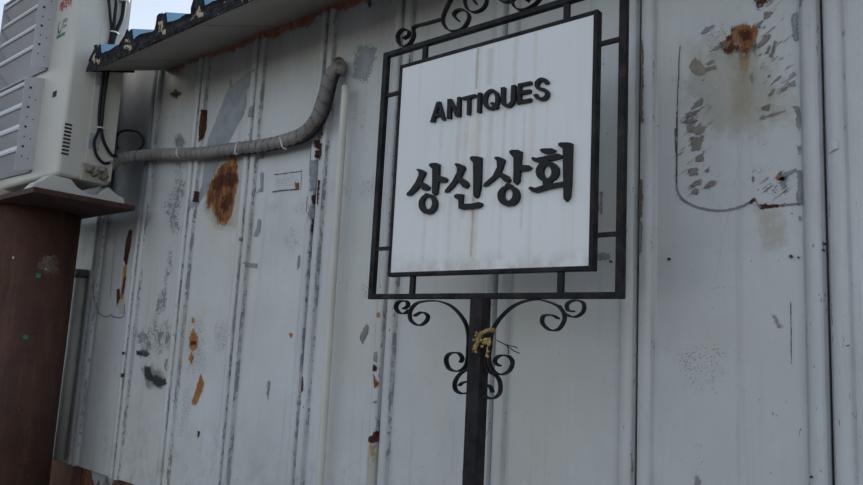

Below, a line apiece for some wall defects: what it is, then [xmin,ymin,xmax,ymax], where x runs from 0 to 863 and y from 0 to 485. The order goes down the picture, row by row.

rust [170,0,372,71]
peeling [353,44,378,86]
peeling [689,25,724,81]
rust [723,23,758,57]
rust [198,109,208,141]
peeling [681,98,715,195]
peeling [760,80,801,129]
rust [192,156,239,225]
peeling [774,169,802,206]
rust [116,229,133,307]
rust [178,318,205,437]